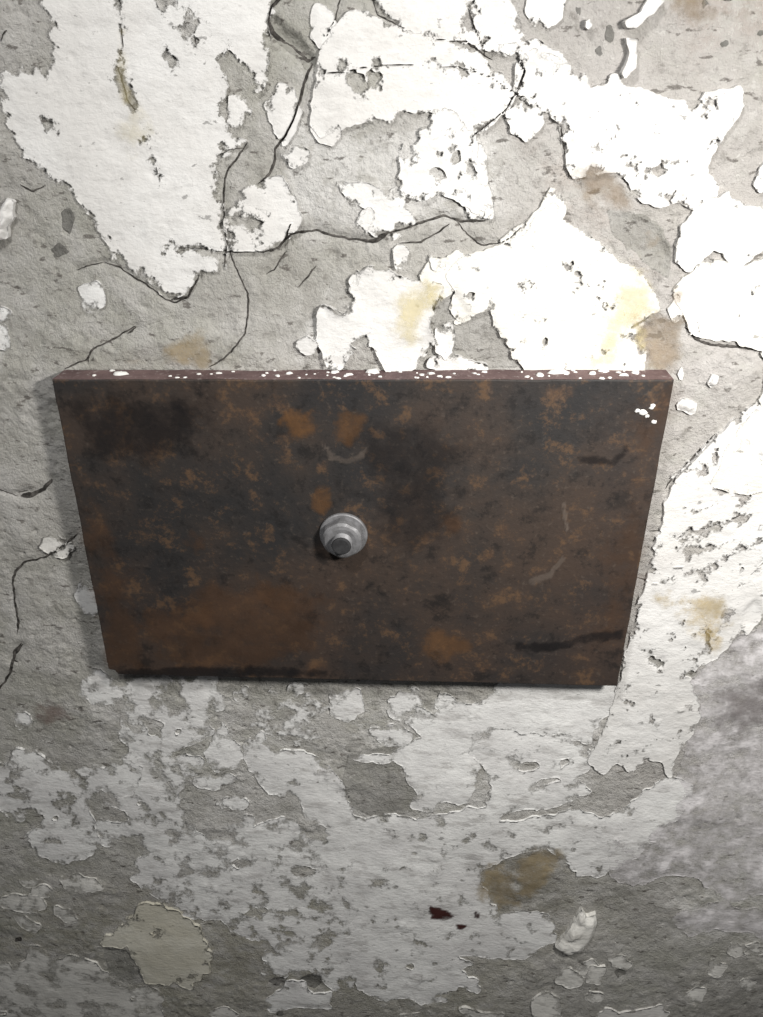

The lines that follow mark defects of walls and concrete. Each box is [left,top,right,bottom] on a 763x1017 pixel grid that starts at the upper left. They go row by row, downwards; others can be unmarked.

crack [118,0,136,110]
crack [259,0,413,183]
crack [432,9,525,138]
crack [77,262,199,303]
crack [174,142,520,367]
peeling [0,0,763,372]
crack [0,533,78,689]
peeling [0,387,763,1017]